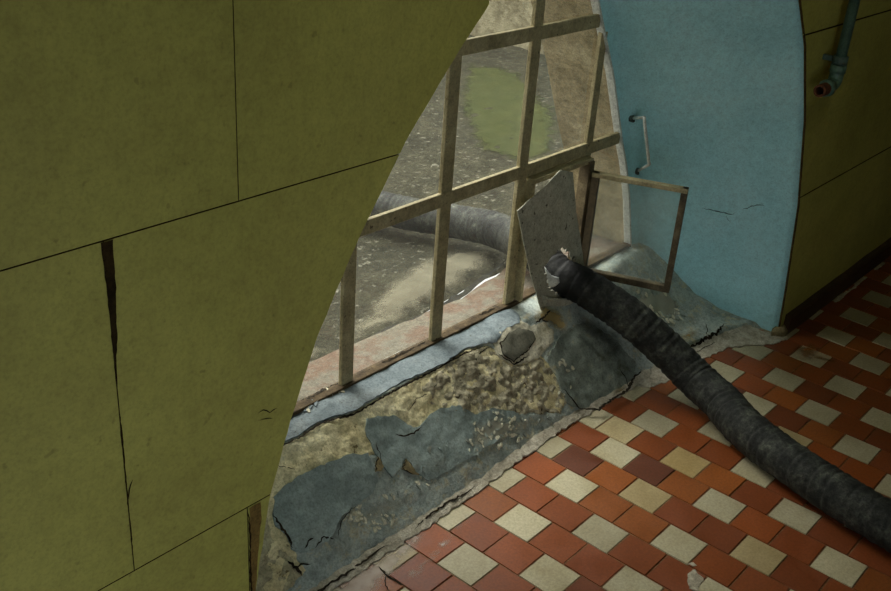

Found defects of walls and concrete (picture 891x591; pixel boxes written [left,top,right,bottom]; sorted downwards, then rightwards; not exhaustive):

crack [101,240,135,567]
spalling [256,308,636,591]
crack [690,323,726,347]